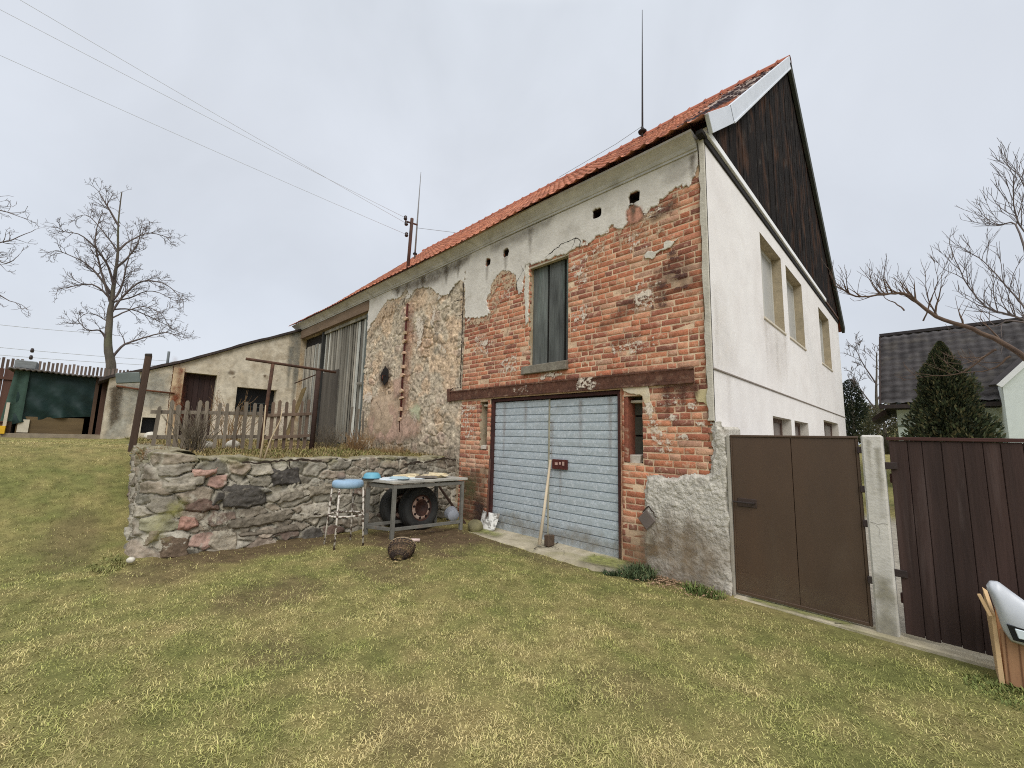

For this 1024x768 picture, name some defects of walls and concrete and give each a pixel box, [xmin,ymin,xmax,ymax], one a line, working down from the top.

flaking render [367,150,699,339]
spalling [379,365,401,397]
flaking render [644,422,733,596]